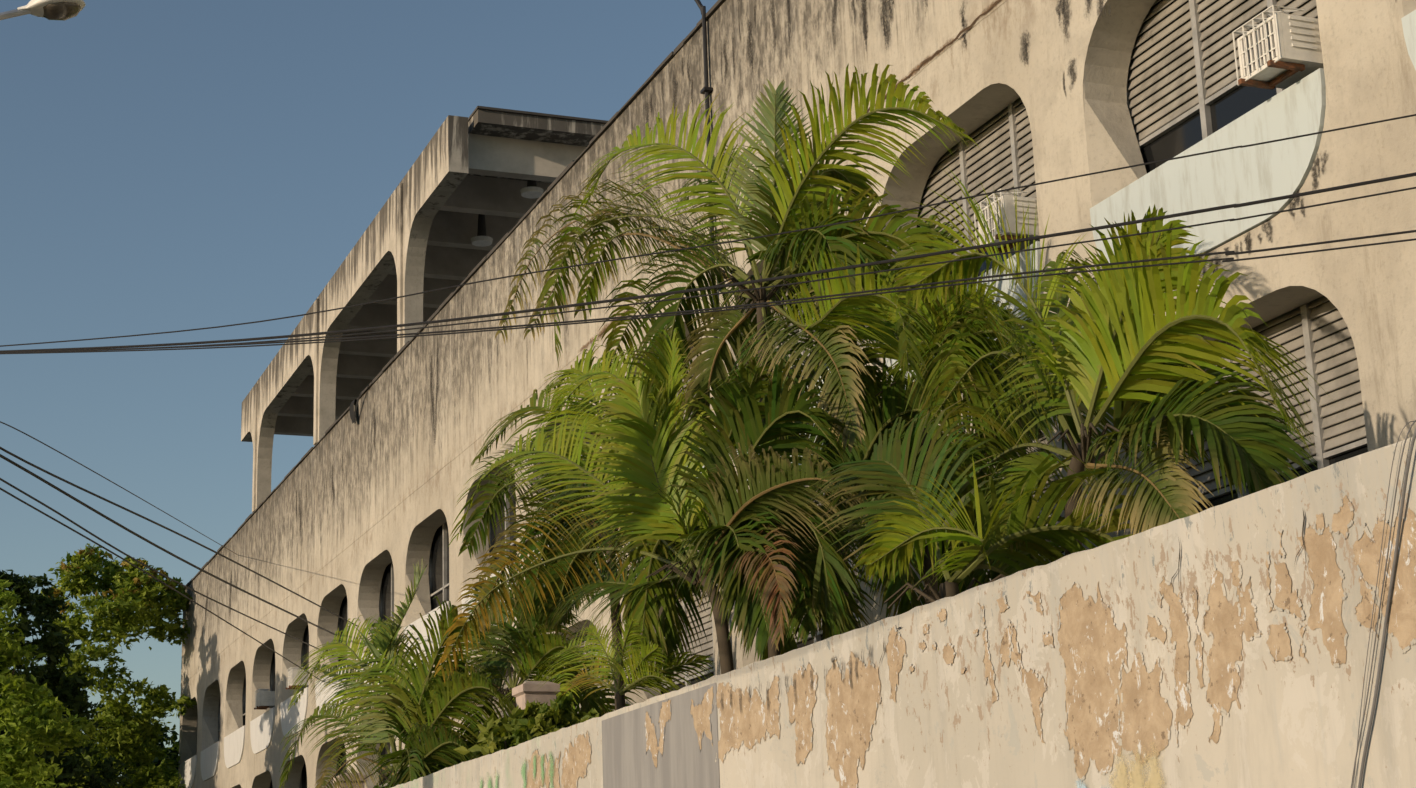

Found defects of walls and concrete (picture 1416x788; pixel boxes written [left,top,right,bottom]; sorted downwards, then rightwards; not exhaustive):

leakage [632,59,693,135]
leakage [721,0,791,81]
leakage [831,0,894,45]
leakage [1056,0,1069,33]
leakage [1063,60,1076,95]
peeling [526,730,591,788]
peeling [644,699,671,768]
peeling [690,608,965,788]
peeling [973,595,1047,743]
peeling [1026,495,1416,782]